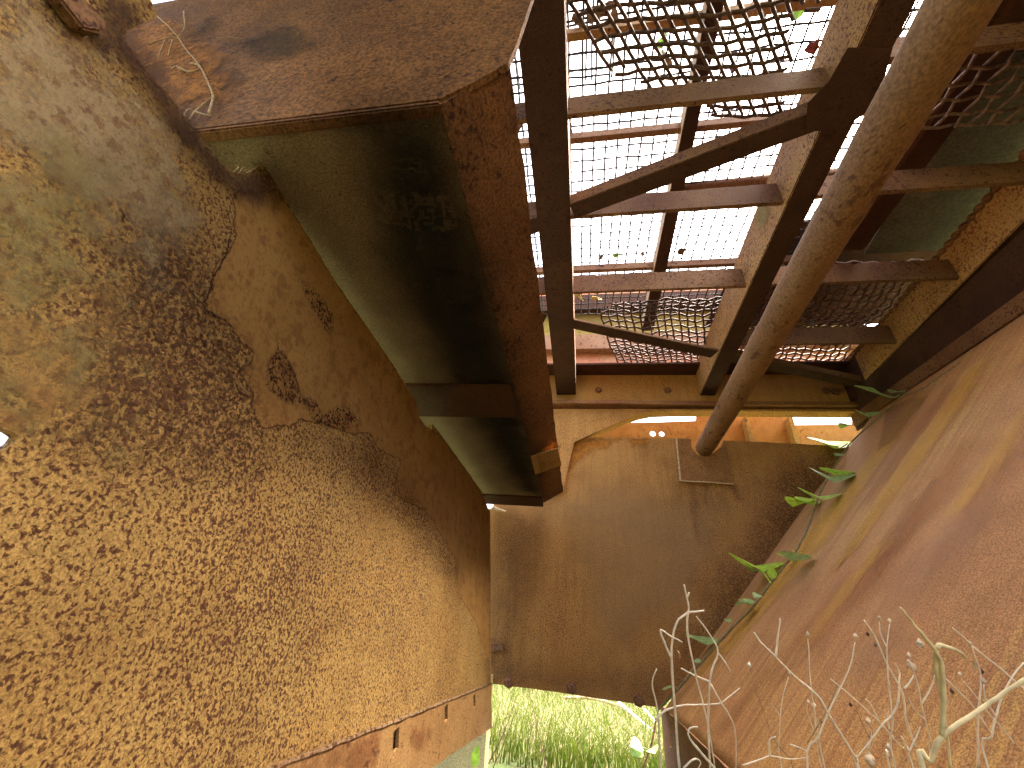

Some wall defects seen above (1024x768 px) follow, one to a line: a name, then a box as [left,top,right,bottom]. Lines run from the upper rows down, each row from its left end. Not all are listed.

rust [85,0,489,662]
rust [568,438,648,469]